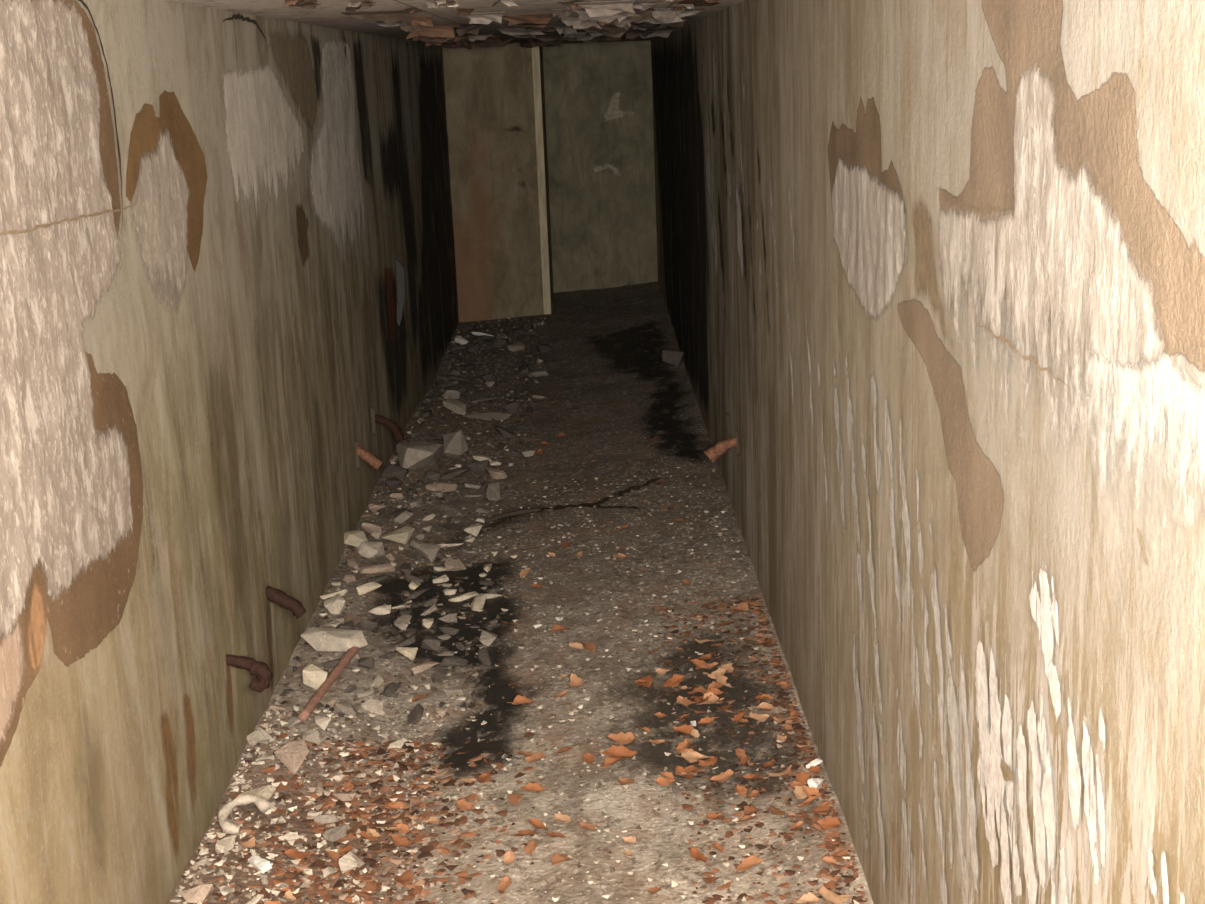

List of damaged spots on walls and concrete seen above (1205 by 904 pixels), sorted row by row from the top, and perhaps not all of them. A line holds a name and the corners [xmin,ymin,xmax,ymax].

peeling [340,0,722,49]
flaking render [222,37,365,253]
flaking render [828,0,1205,571]
flaking render [0,0,207,767]
rust [704,437,736,464]
rust [226,586,306,729]
water stain [1148,843,1185,904]